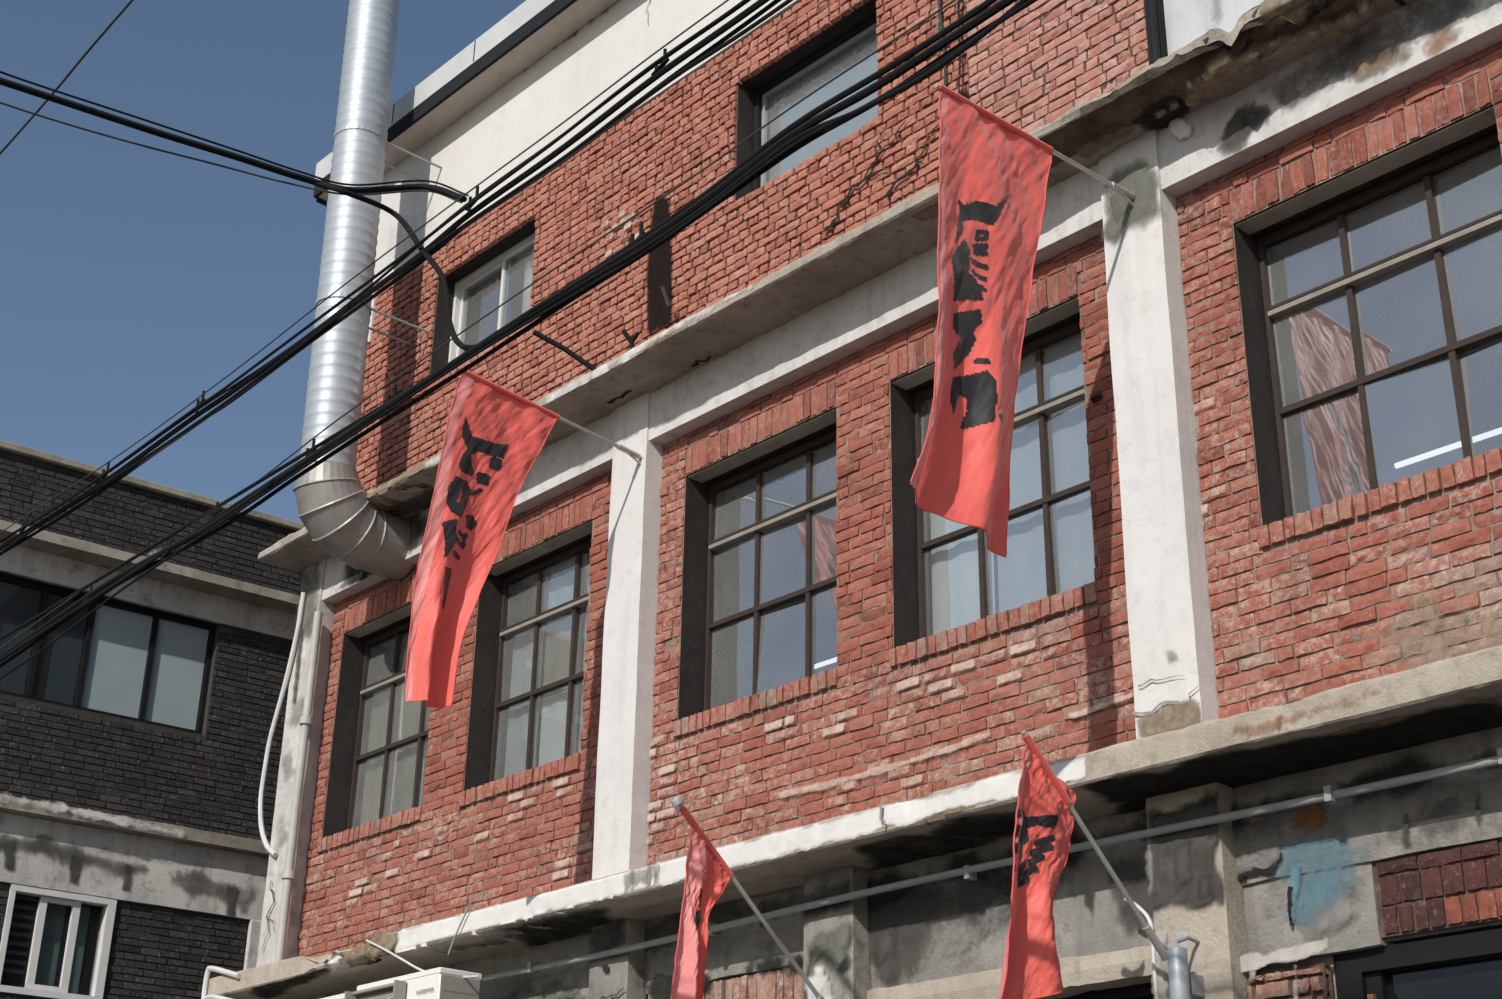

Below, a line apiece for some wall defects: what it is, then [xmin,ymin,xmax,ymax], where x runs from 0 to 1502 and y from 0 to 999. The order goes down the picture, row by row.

spalling [1076,0,1377,158]
leakage [1279,0,1471,105]
crack [1133,675,1199,715]
leakage [1066,699,1502,930]
leakage [0,834,145,891]
leakage [176,871,254,917]
leakage [505,980,584,999]
mould [643,975,673,999]